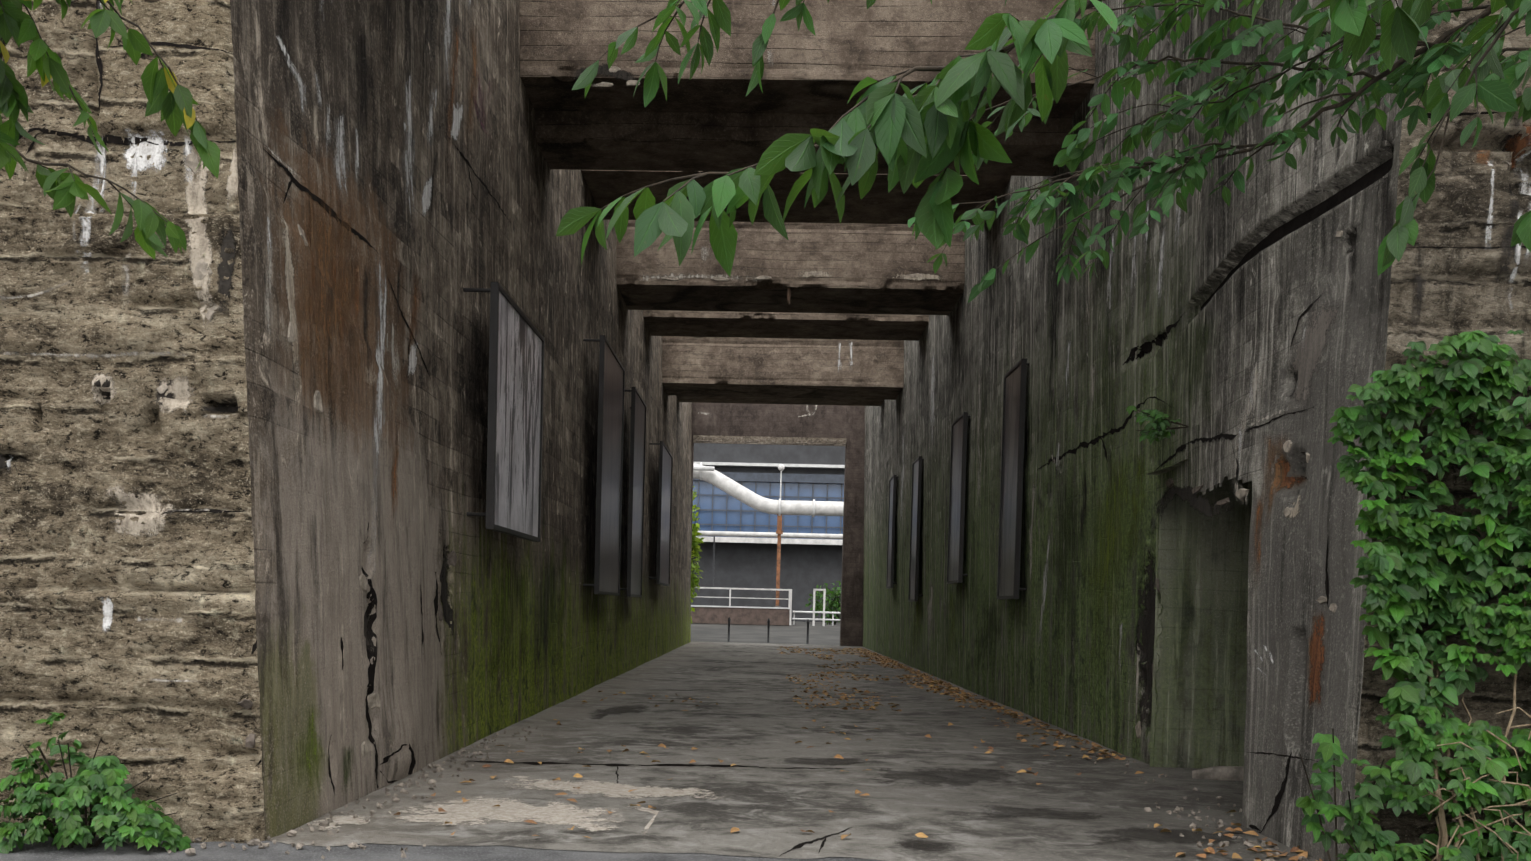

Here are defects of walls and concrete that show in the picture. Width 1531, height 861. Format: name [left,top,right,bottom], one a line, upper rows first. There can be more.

damp [75,145,106,257]
damp [125,130,167,187]
crack [19,0,432,383]
damp [1486,113,1531,282]
damp [1412,250,1425,326]
crack [1123,312,1185,365]
crack [1037,396,1171,470]
crack [1154,407,1314,493]
crack [328,522,416,796]
corrosion [1309,536,1337,708]
damp [593,705,648,719]
crack [1248,752,1318,833]